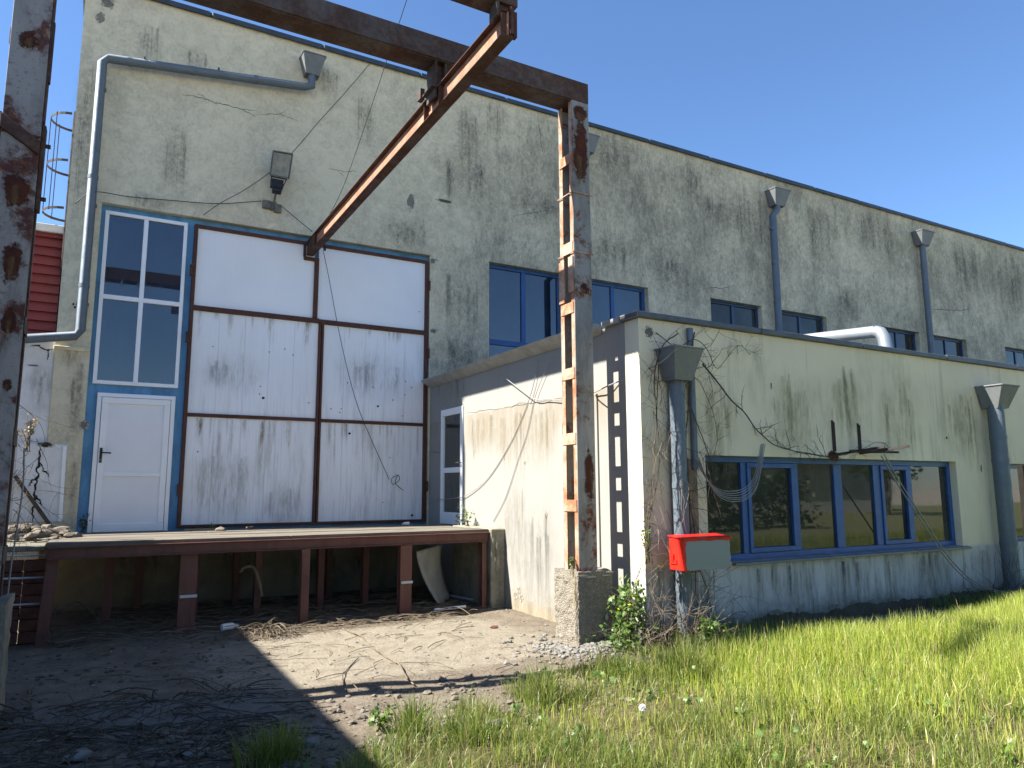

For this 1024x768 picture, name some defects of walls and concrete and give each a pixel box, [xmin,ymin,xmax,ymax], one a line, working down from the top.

corrosion [19,31,39,50]
crack [187,94,297,121]
corrosion [573,105,589,184]
corrosion [2,171,30,207]
corrosion [1,242,23,284]
corrosion [1,307,16,333]
crack [28,449,50,522]